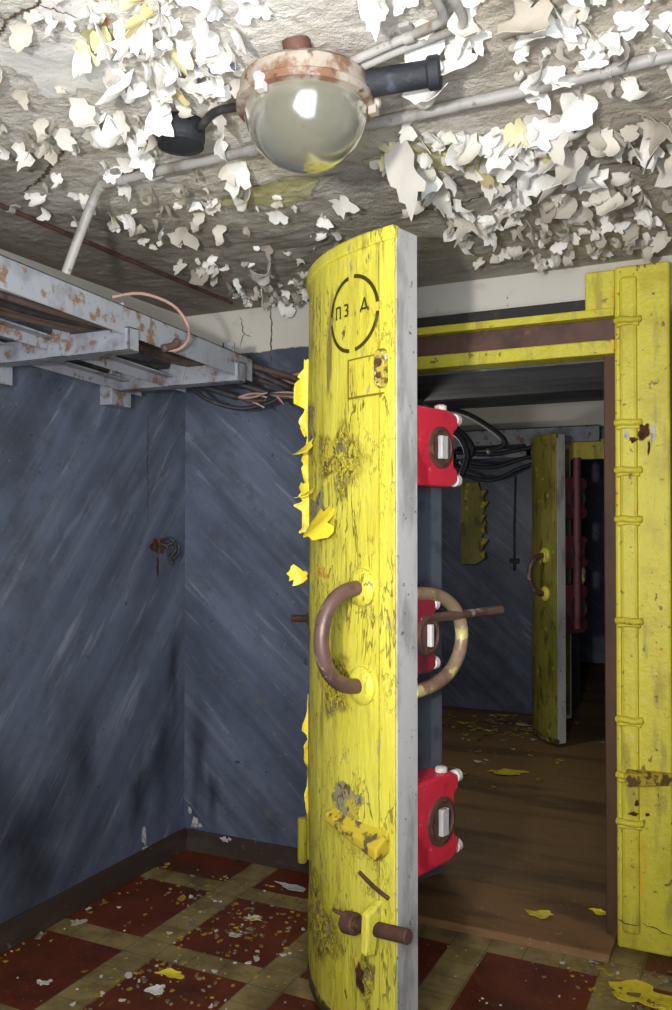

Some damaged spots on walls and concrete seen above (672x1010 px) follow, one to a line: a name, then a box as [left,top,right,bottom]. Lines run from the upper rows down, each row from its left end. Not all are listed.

peeling [0,0,360,318]
peeling [358,0,672,274]